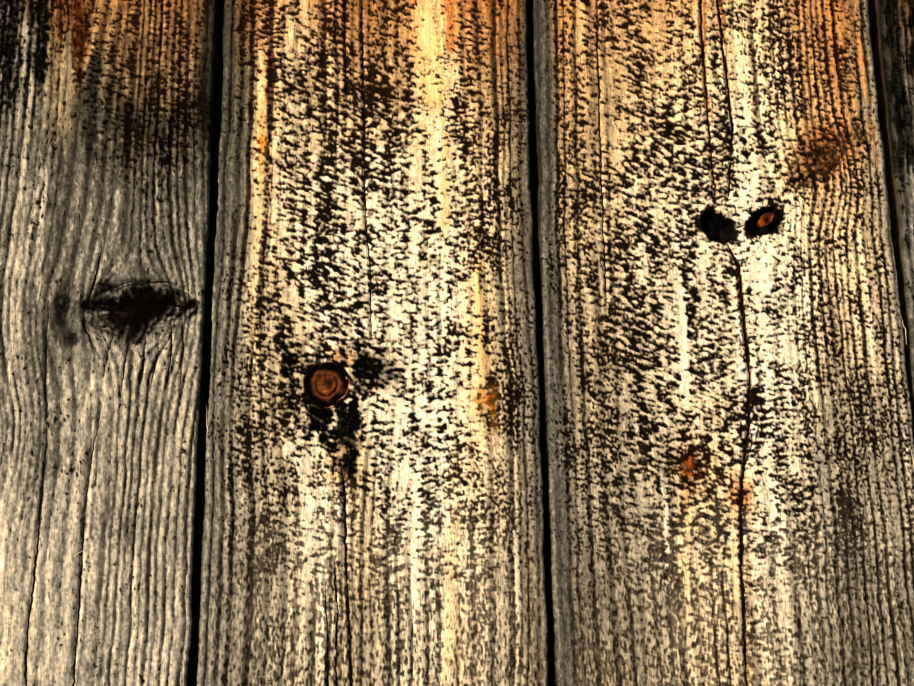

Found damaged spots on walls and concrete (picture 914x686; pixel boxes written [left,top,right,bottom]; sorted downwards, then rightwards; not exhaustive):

crack [699,0,734,208]
crack [725,224,753,686]